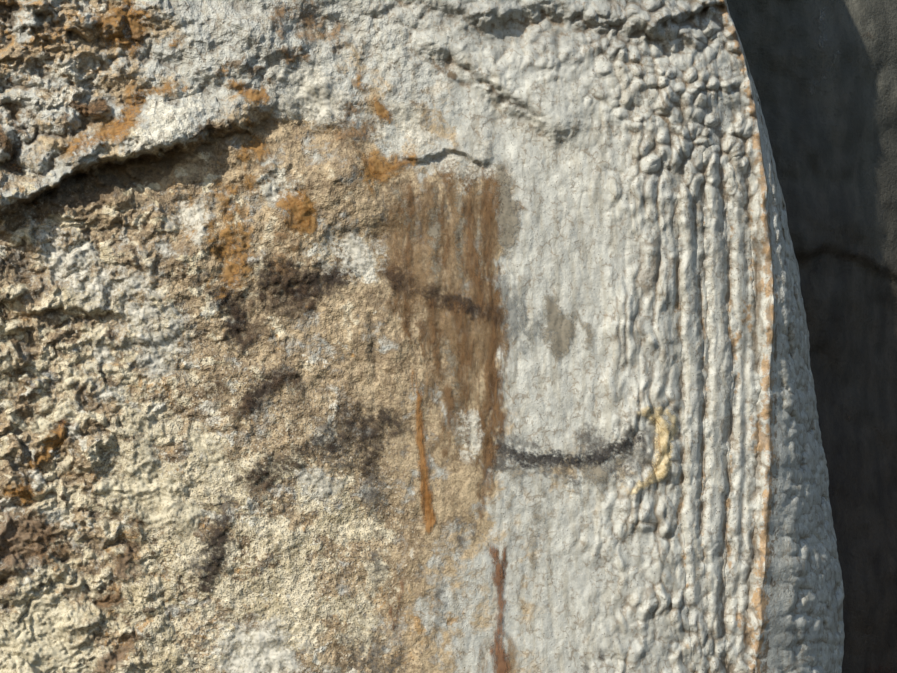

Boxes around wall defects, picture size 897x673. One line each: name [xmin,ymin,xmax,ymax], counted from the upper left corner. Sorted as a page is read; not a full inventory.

rust [269,1,342,64]
rust [329,98,392,141]
rust [358,150,417,194]
rust [374,160,509,533]
rust [480,545,515,673]